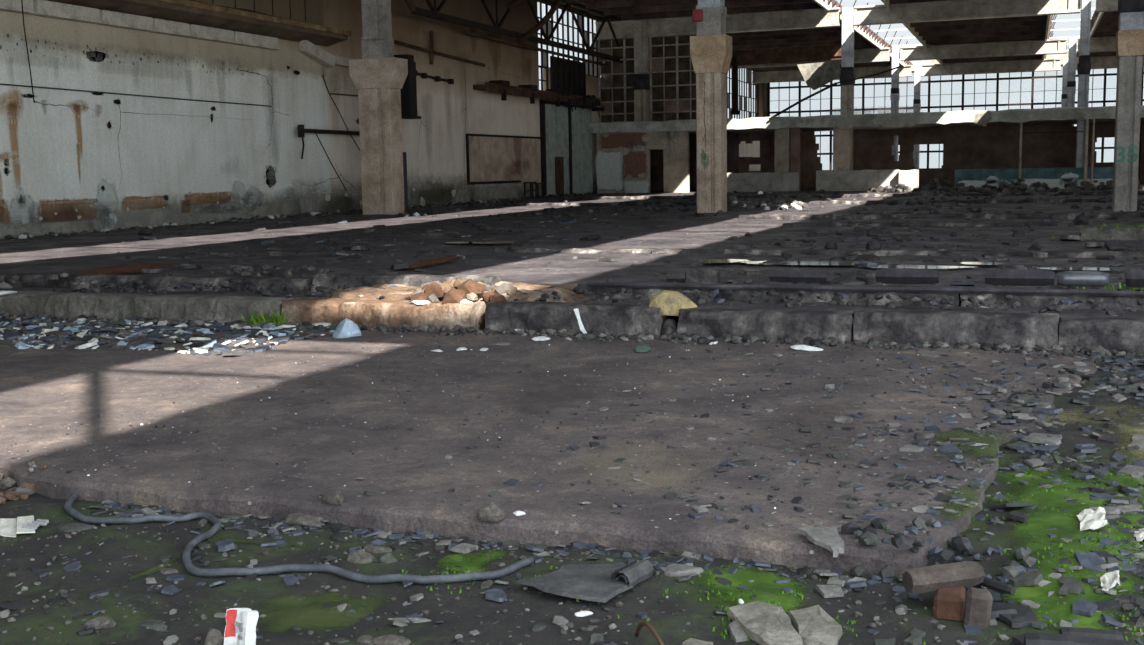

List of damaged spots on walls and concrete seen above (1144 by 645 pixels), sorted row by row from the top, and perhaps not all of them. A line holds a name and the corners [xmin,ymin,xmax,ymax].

corrosion [0,92,21,180]
corrosion [71,104,85,178]
spalling [0,165,294,231]
flaking render [596,133,650,193]